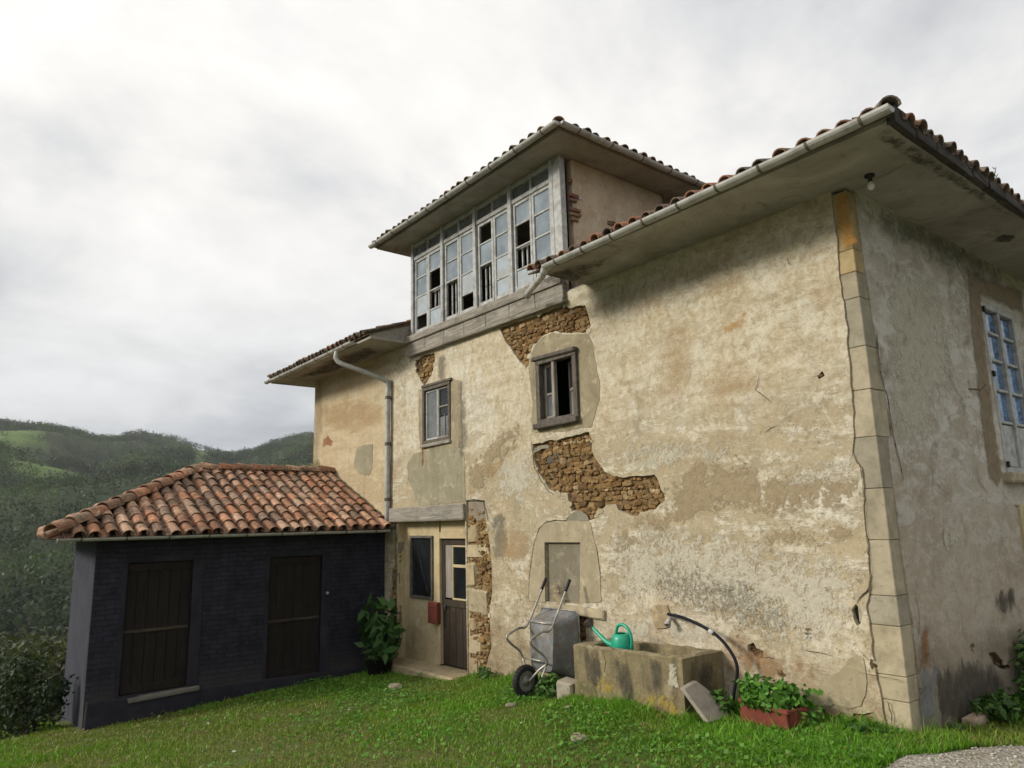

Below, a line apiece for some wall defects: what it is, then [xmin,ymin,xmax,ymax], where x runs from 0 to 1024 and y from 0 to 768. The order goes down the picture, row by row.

spalling [567,178,582,222]
spalling [502,303,592,368]
spalling [414,354,436,385]
spalling [535,432,857,553]
spalling [468,425,519,675]
leakage [921,660,1002,722]